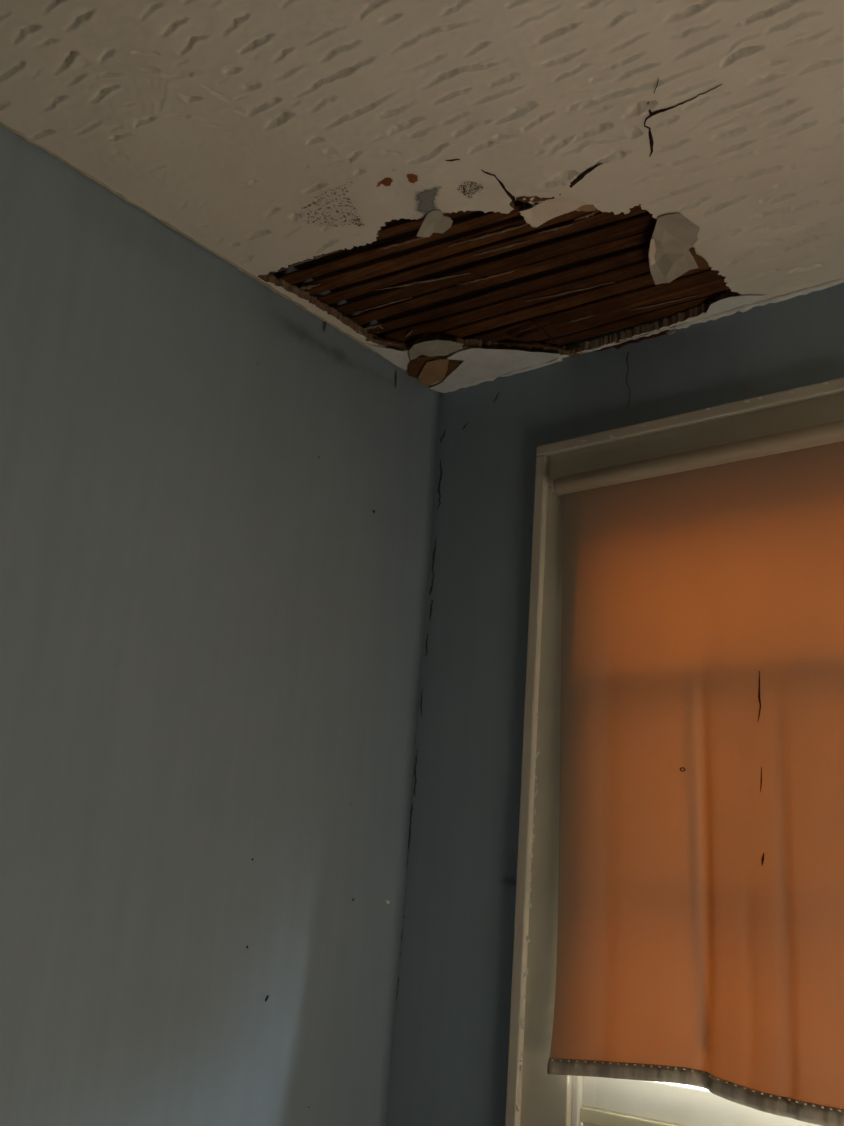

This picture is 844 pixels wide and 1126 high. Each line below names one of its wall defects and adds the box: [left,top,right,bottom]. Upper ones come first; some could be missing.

crack [644,77,723,157]
peeling [416,210,453,238]
crack [446,159,602,204]
peeling [519,197,597,227]
peeling [648,213,709,285]
peeling [366,327,675,393]